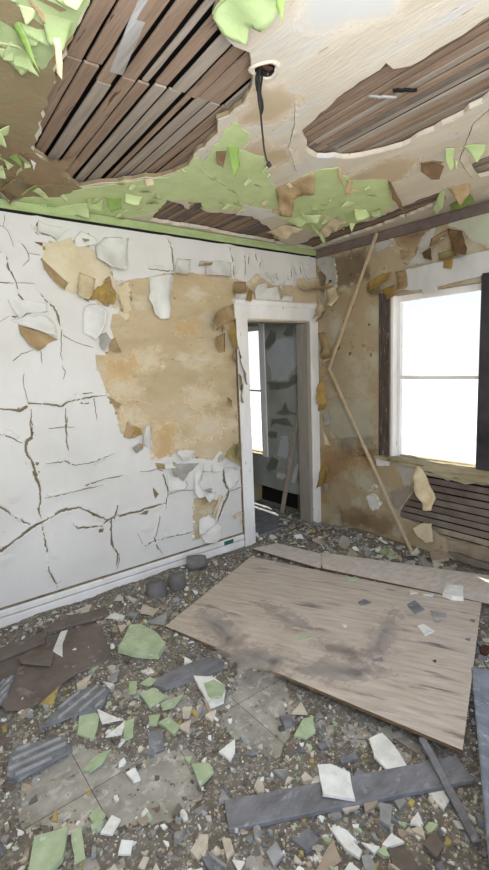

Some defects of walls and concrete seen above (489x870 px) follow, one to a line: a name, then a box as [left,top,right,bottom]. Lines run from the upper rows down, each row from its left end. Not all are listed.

flaking render [0,0,489,249]
crack [228,249,262,279]
peeling [8,300,58,351]
crack [0,216,194,584]
flaking render [35,221,372,543]
crack [217,470,241,522]
flaking render [399,474,489,548]